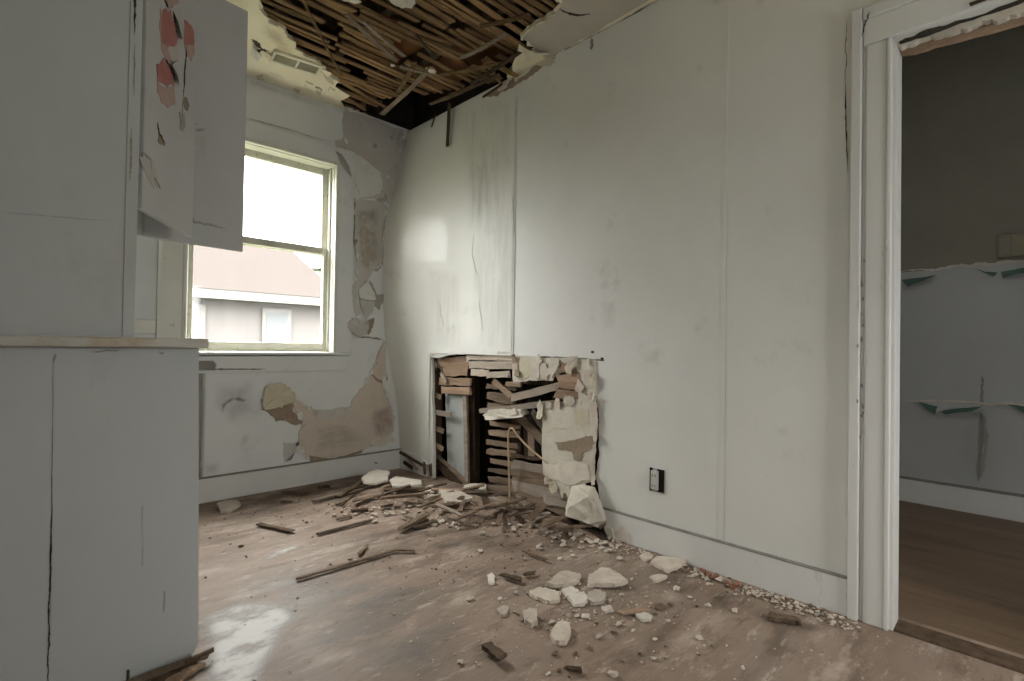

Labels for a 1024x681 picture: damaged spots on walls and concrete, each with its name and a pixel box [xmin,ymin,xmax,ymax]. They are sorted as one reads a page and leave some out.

crack [845,11,870,172]
spalling [897,0,1024,57]
peeling [283,106,406,463]
spalling [430,351,631,545]